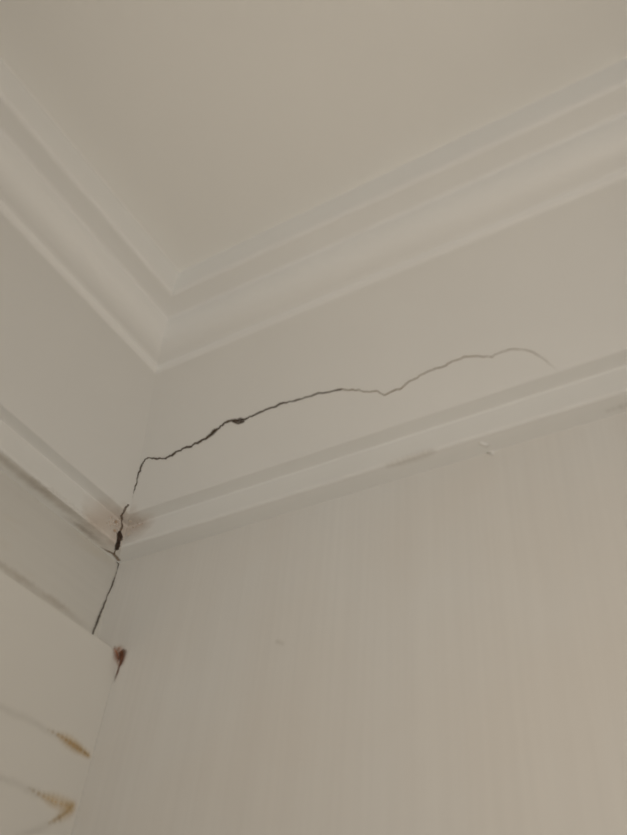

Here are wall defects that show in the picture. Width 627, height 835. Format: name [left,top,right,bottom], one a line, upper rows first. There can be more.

crack [133,349,537,493]
crack [92,550,120,634]
corrosion [114,648,125,678]